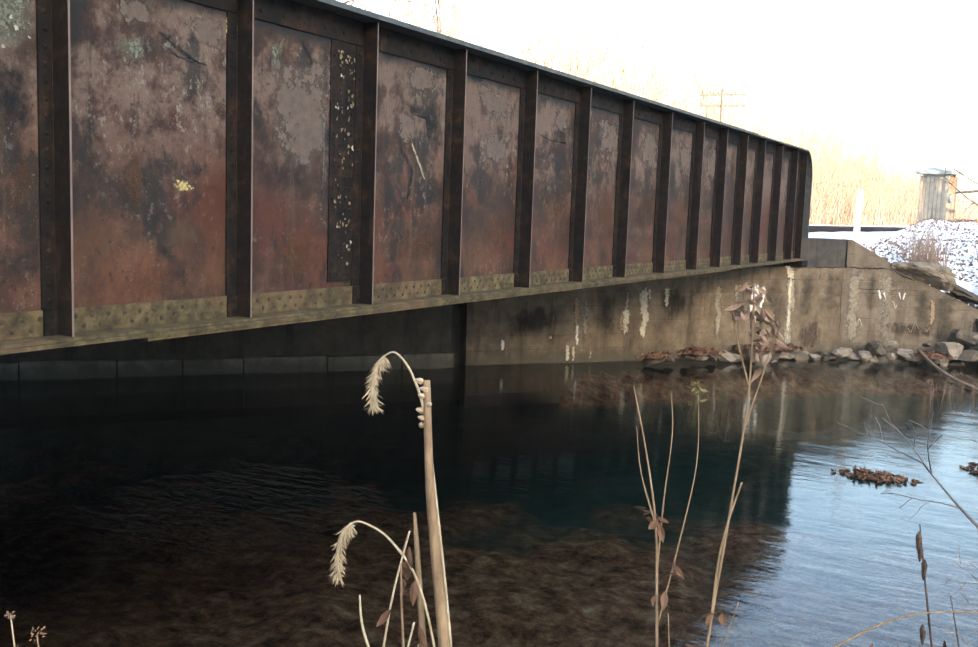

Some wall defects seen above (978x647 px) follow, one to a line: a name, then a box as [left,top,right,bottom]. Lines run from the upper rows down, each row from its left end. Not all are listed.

peeling [119,0,152,24]
peeling [118,38,144,59]
corrosion [160,32,206,65]
corrosion [408,104,441,146]
water stain [501,307,556,351]
water stain [639,287,651,338]
water stain [664,287,696,319]
efflorescence [714,286,722,335]
efflorescence [750,285,765,321]
water stain [784,266,821,347]